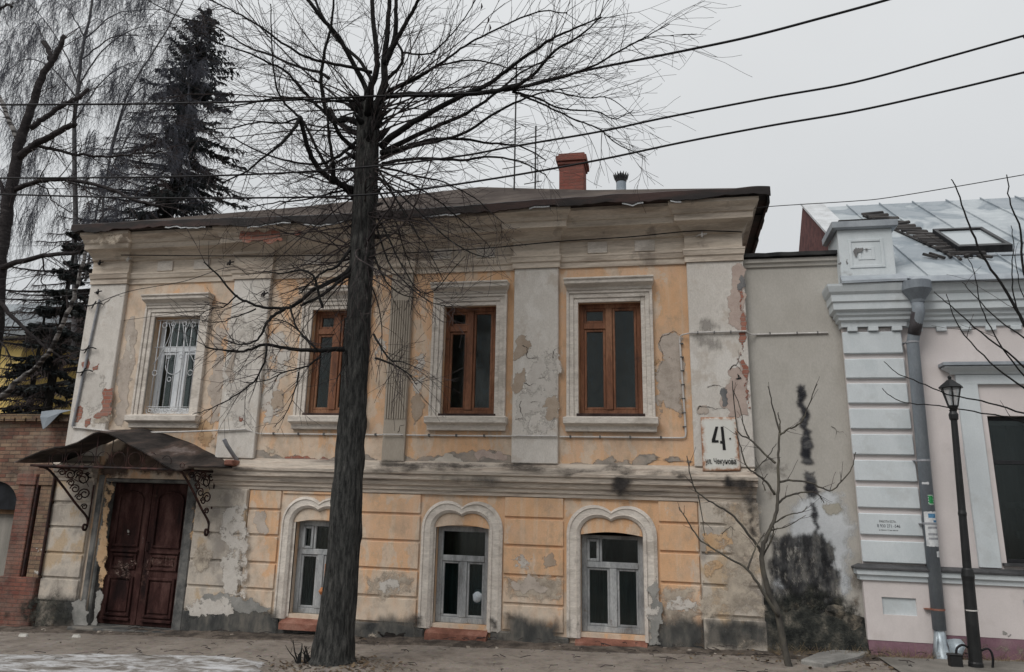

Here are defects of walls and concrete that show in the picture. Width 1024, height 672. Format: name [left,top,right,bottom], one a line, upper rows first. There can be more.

flaking render [74,316,138,427]
flaking render [511,335,562,435]
flaking render [696,263,751,418]
spalling [255,448,335,460]
spalling [405,449,511,463]
spalling [571,454,692,465]
damp [765,385,857,615]
peeling [185,503,269,618]
peeling [508,553,562,601]
peeling [644,503,766,622]